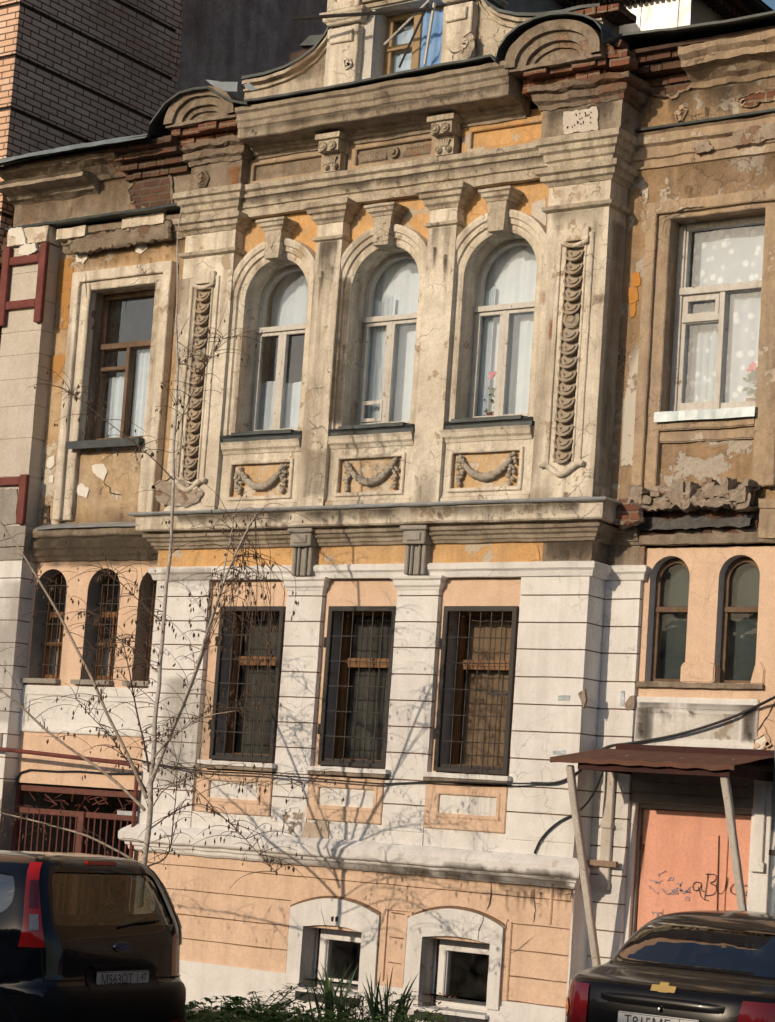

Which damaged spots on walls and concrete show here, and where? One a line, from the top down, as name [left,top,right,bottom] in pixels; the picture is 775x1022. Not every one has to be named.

flaking render [736,87,775,108]
flaking render [128,174,173,221]
peeling [56,258,74,329]
peeling [628,272,641,318]
peeling [49,355,66,377]
peeling [621,348,639,466]
peeling [46,455,55,483]
peeling [92,464,108,481]
peeling [76,483,90,498]